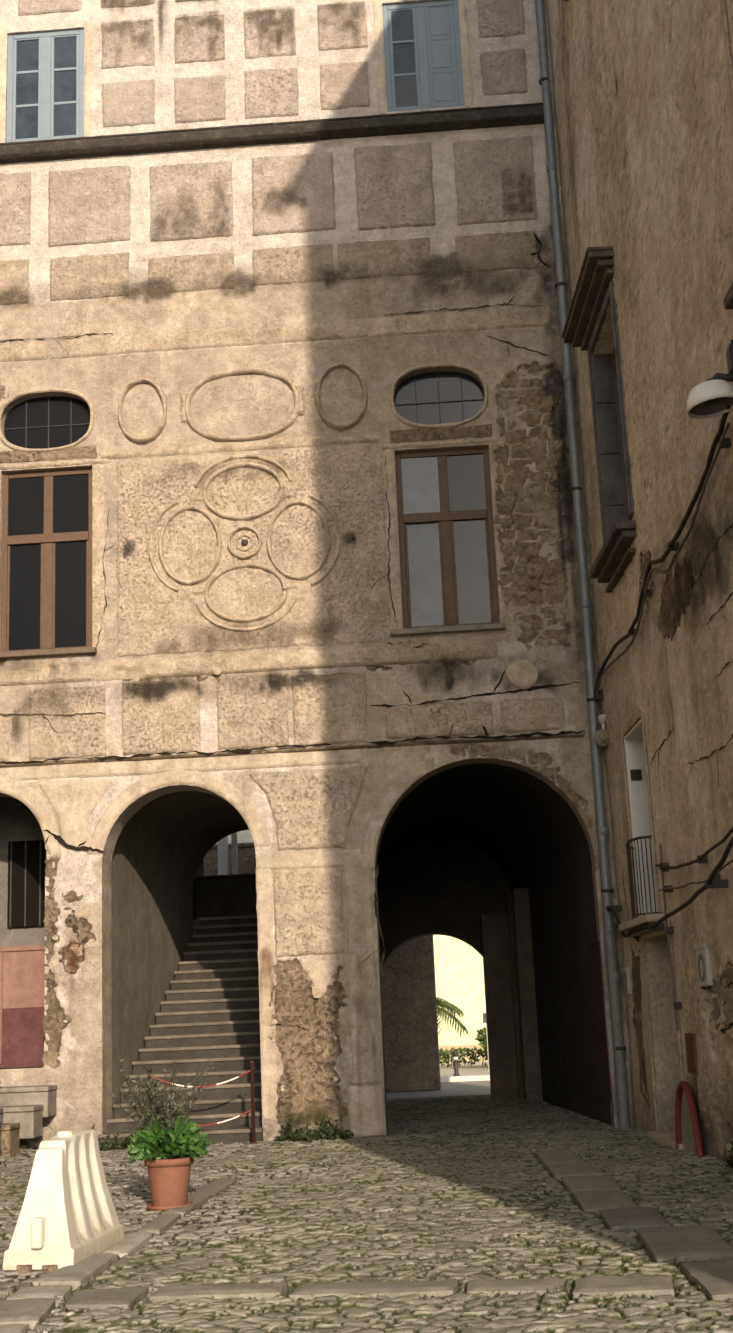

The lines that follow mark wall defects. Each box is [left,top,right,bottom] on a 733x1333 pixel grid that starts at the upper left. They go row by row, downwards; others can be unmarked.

leakage [103,0,165,41]
leakage [178,12,220,50]
leakage [249,8,293,42]
leakage [328,3,359,25]
flaking render [494,361,571,651]
crack [706,592,733,626]
crack [0,669,585,764]
crack [651,724,733,787]
flaking render [42,849,96,1068]
flaking render [269,958,348,1129]